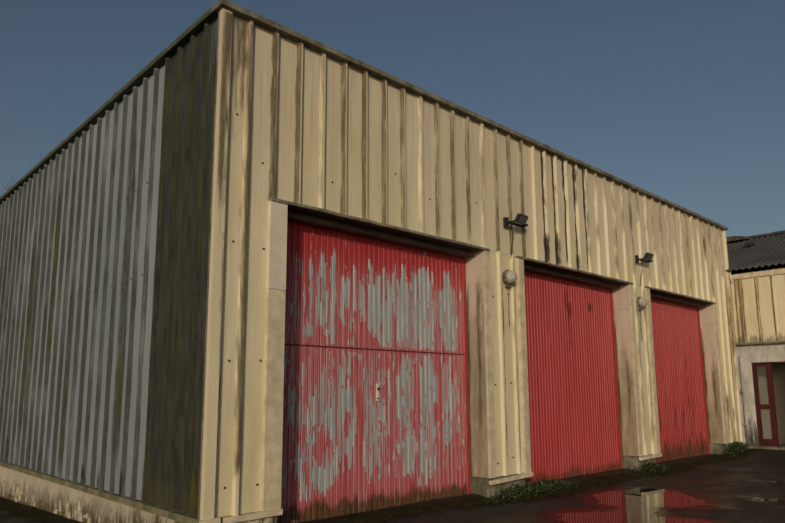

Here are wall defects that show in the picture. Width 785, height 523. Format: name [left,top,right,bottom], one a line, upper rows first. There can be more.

water stain [0,12,253,523]
water stain [269,33,277,198]
water stain [493,130,526,257]
water stain [541,151,588,269]
peeling [283,248,466,502]
water stain [277,293,481,523]
water stain [615,328,629,455]